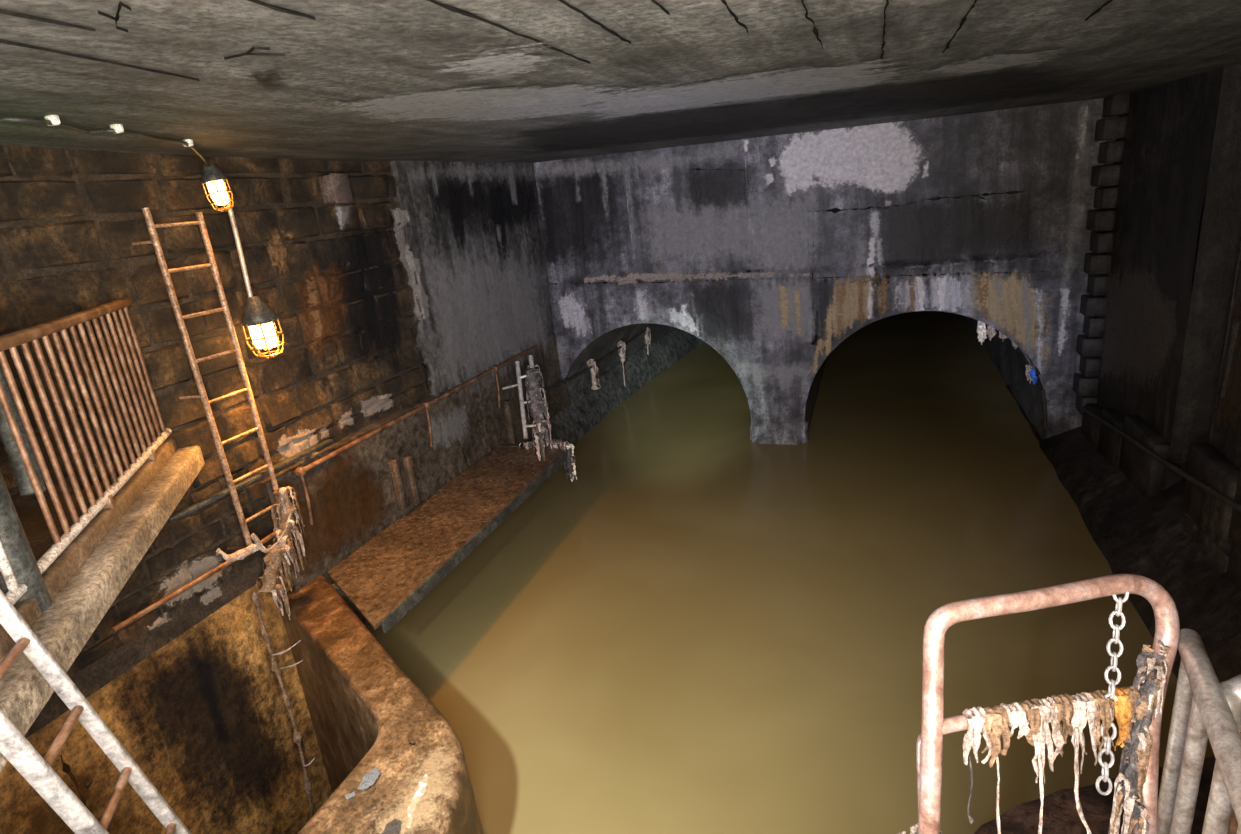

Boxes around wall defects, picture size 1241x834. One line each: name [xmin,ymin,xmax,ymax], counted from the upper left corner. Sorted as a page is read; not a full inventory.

crack [0,2,199,81]
crack [224,46,285,60]
crack [248,0,315,20]
crack [427,0,590,64]
crack [558,0,631,44]
crack [651,0,670,15]
damp [1076,104,1088,185]
damp [411,139,835,390]
corrosion [813,277,887,374]
damp [853,195,1038,312]
corrosion [971,269,1050,371]
damp [1058,244,1072,356]